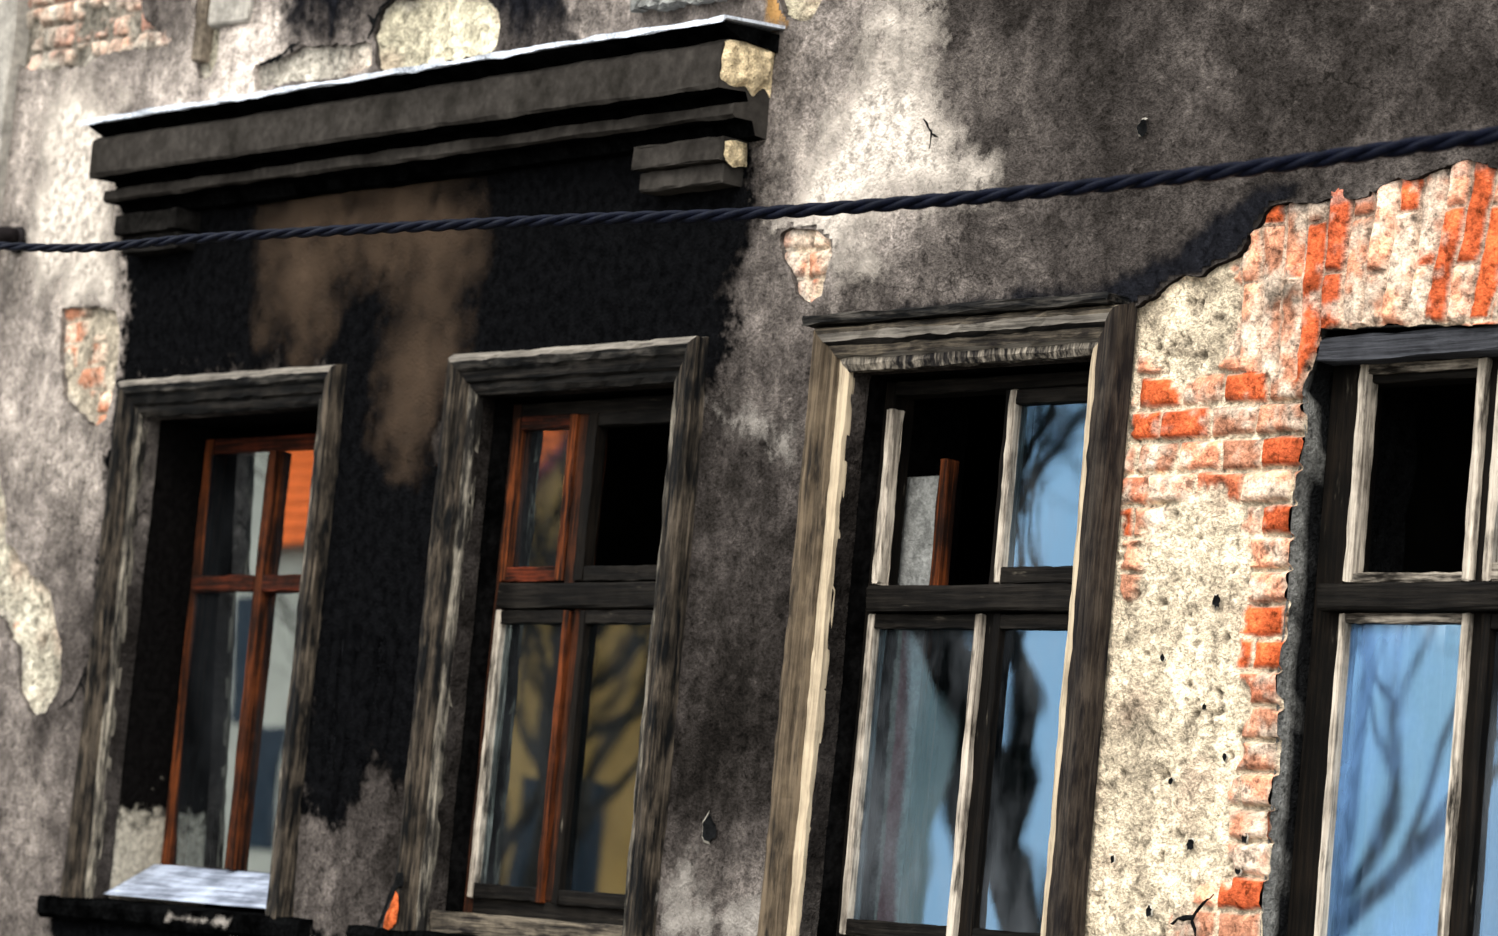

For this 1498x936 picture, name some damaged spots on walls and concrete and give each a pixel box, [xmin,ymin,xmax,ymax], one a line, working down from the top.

spalling [24,0,172,72]
spalling [258,0,500,89]
spalling [785,0,822,21]
damp [772,0,998,279]
spalling [1136,117,1148,137]
spalling [784,228,832,303]
spalling [65,307,120,426]
spalling [1085,160,1498,936]
spalling [0,476,62,715]
crack [1170,894,1214,936]